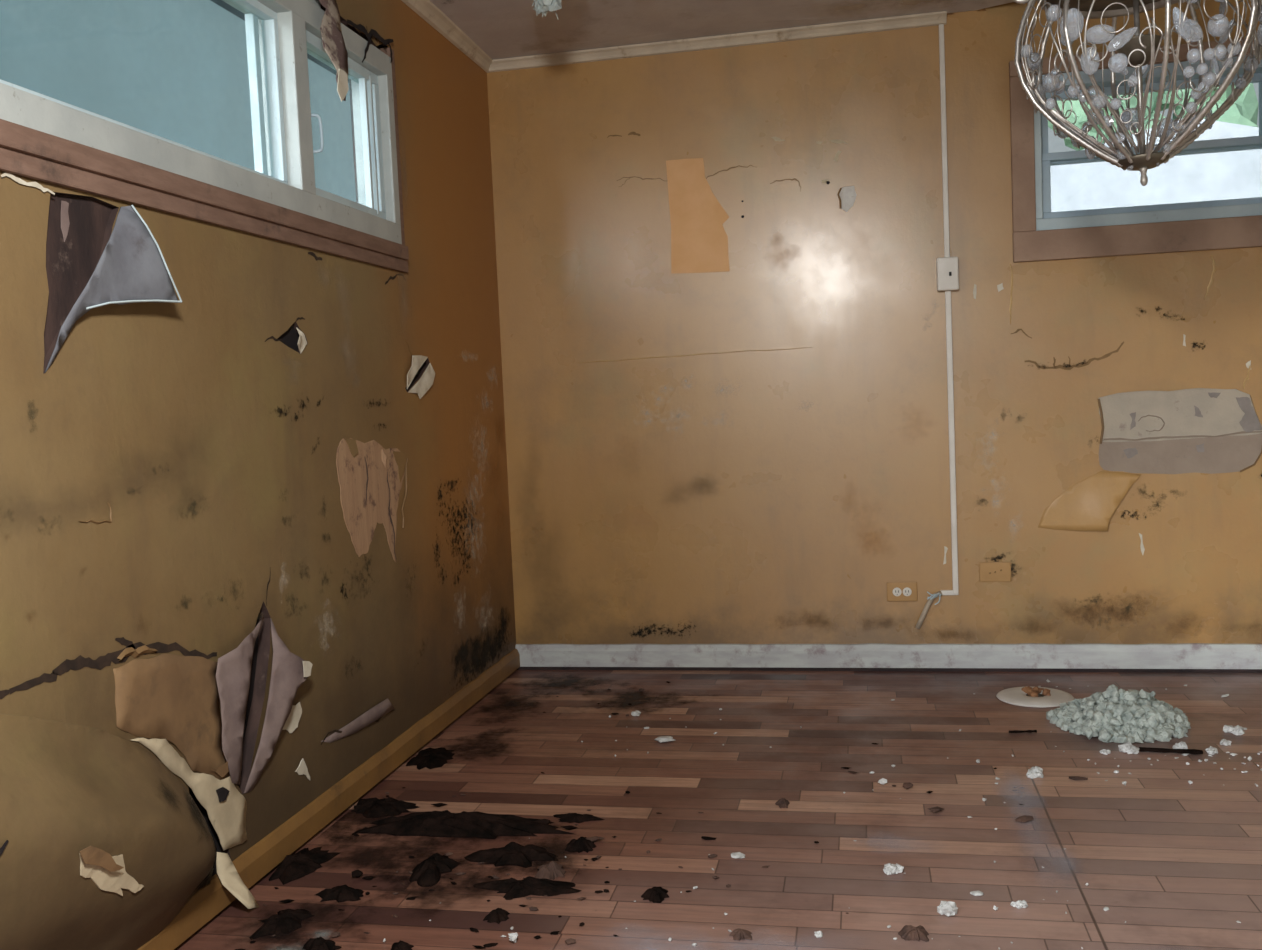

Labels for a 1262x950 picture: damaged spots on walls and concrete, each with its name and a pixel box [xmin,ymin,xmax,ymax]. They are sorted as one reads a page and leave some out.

crack [1011,329,1124,370]
spalling [1098,388,1262,474]
peeling [336,437,408,562]
leakage [432,480,478,585]
leakage [631,624,691,637]
crack [0,637,217,699]
peeling [303,661,313,677]
peeling [113,654,259,909]
crack [0,840,9,856]
peeling [79,846,144,896]